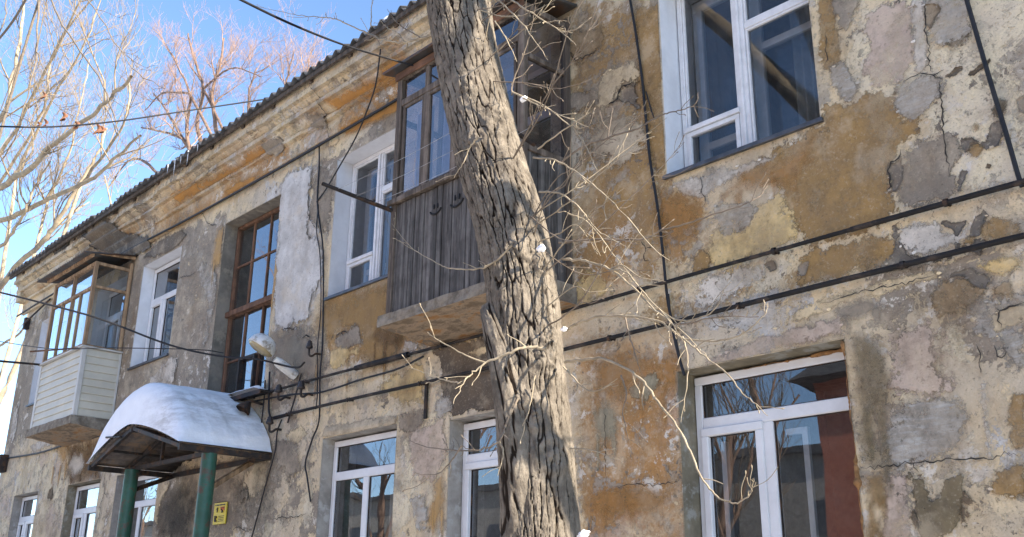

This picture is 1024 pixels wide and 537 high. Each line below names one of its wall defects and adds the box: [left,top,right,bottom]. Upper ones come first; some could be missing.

peeling [570,0,665,171]
crack [903,3,950,171]
flaking render [53,221,186,258]
peeling [329,323,364,369]
peeling [673,0,1024,537]
crack [865,451,1021,471]